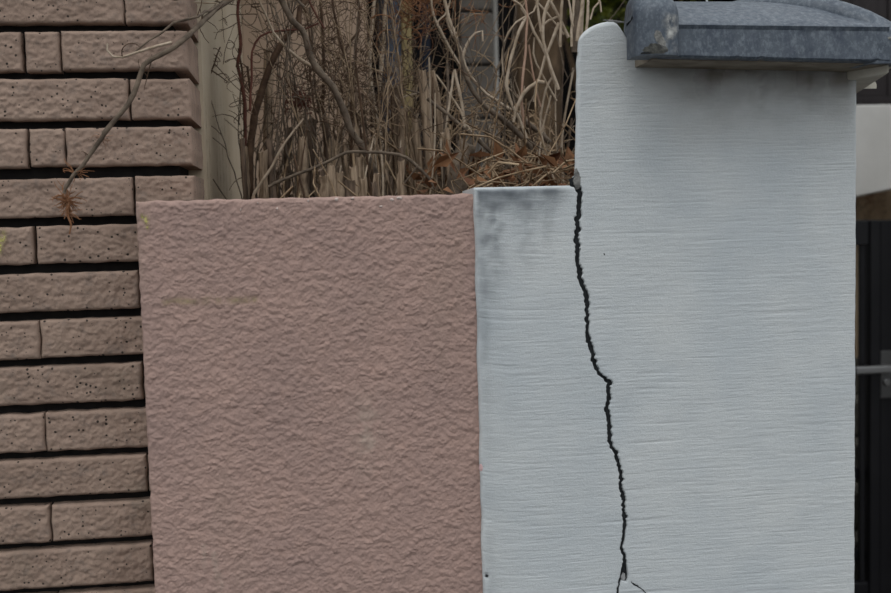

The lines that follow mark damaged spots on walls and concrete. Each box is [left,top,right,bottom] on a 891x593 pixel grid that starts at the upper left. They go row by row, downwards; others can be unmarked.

crack [568,178,646,593]